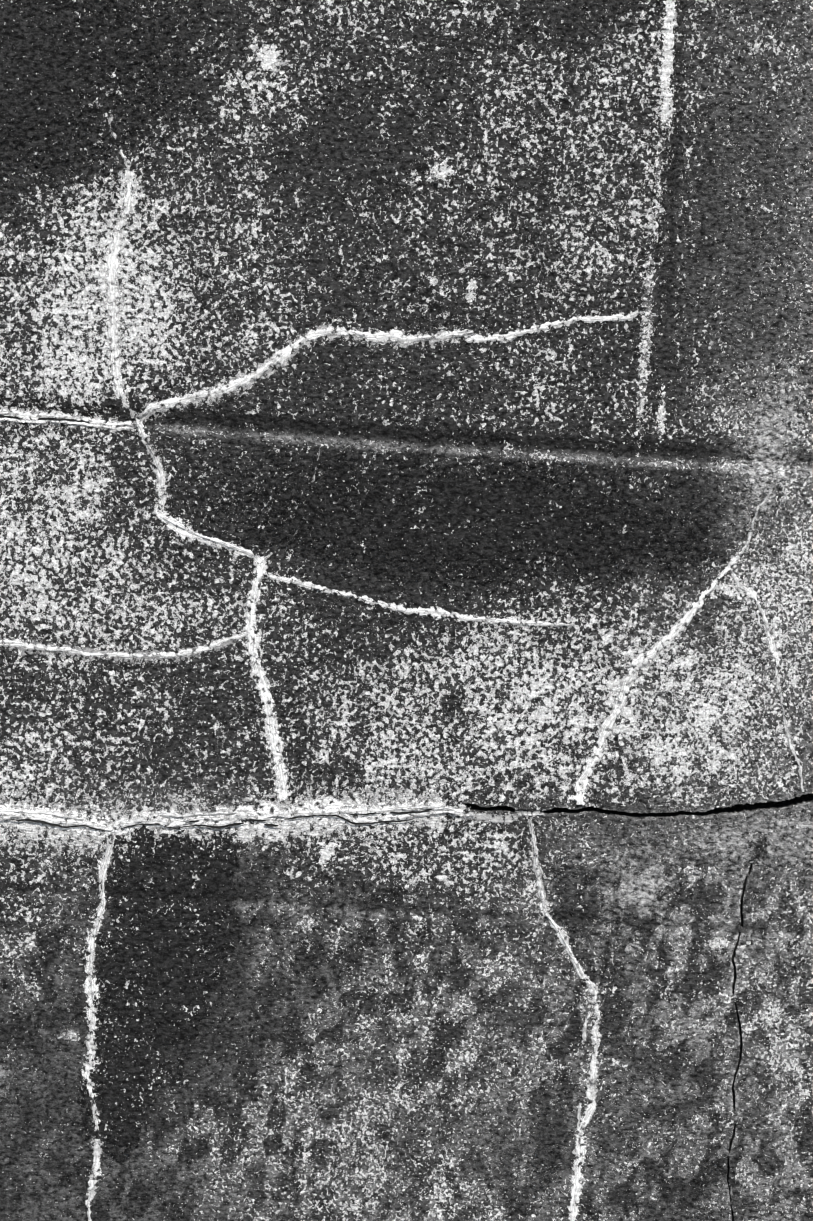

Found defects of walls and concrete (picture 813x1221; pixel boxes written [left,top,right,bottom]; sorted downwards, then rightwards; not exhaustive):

crack [108,115,117,138]
crack [0,146,640,804]
crack [0,485,813,1221]